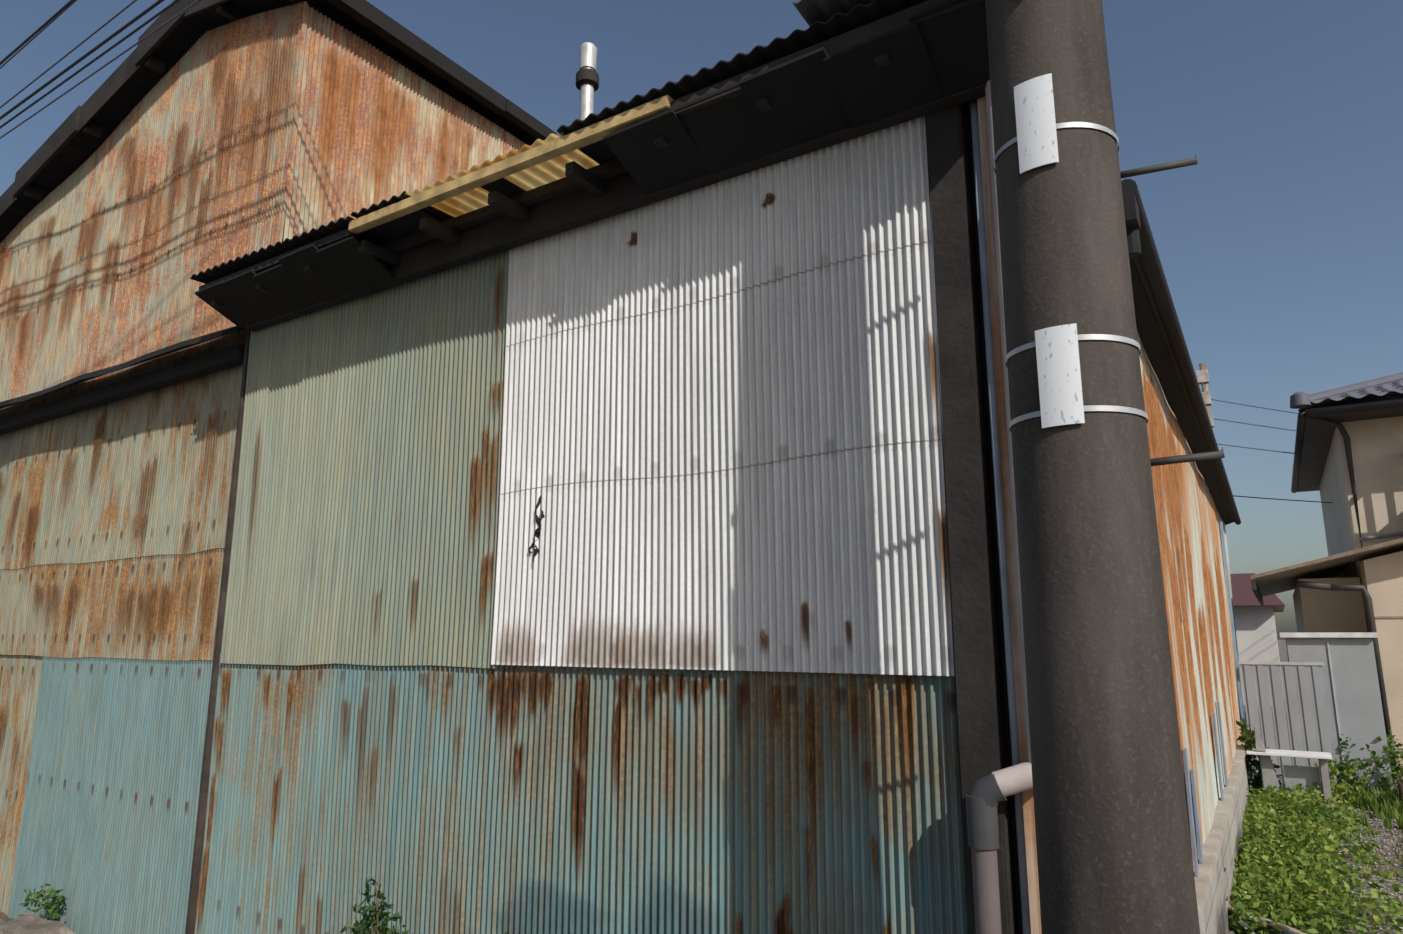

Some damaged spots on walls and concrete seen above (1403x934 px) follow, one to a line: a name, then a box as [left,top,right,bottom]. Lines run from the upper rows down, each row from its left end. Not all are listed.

rust [320,49,361,186]
rust [374,75,405,205]
rust [469,428,498,531]
rust [480,555,493,613]
rust [1143,375,1231,741]
rust [197,670,231,925]
rust [272,770,282,834]
rust [488,668,553,778]
rust [572,676,590,866]
rust [613,672,747,784]
rust [805,688,815,893]
rust [900,675,914,750]